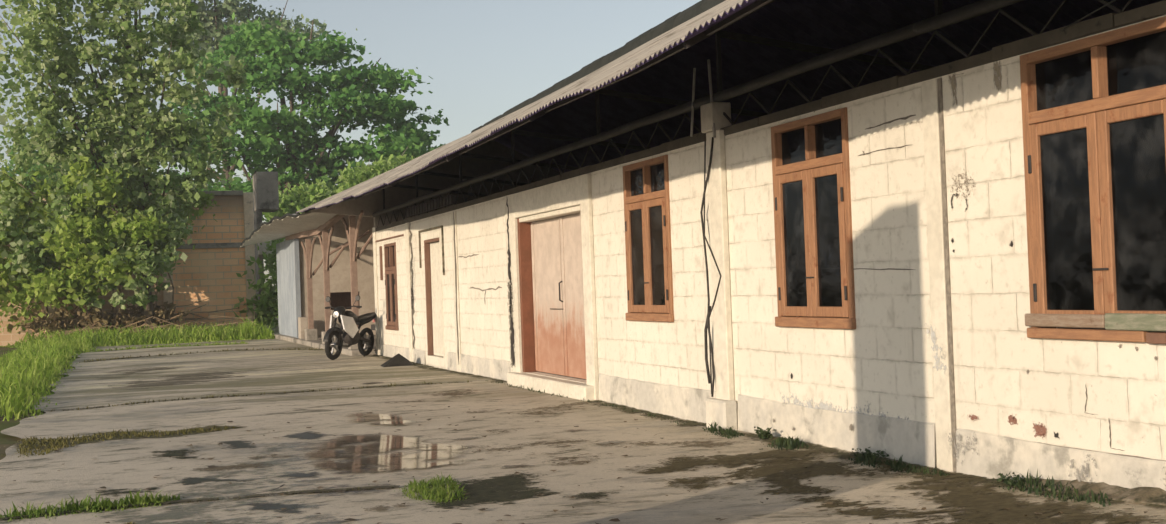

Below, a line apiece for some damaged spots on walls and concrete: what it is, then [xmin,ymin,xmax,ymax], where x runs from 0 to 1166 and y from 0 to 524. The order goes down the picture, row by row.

crack [46,199,516,411]
spalling [1033,422,1060,440]